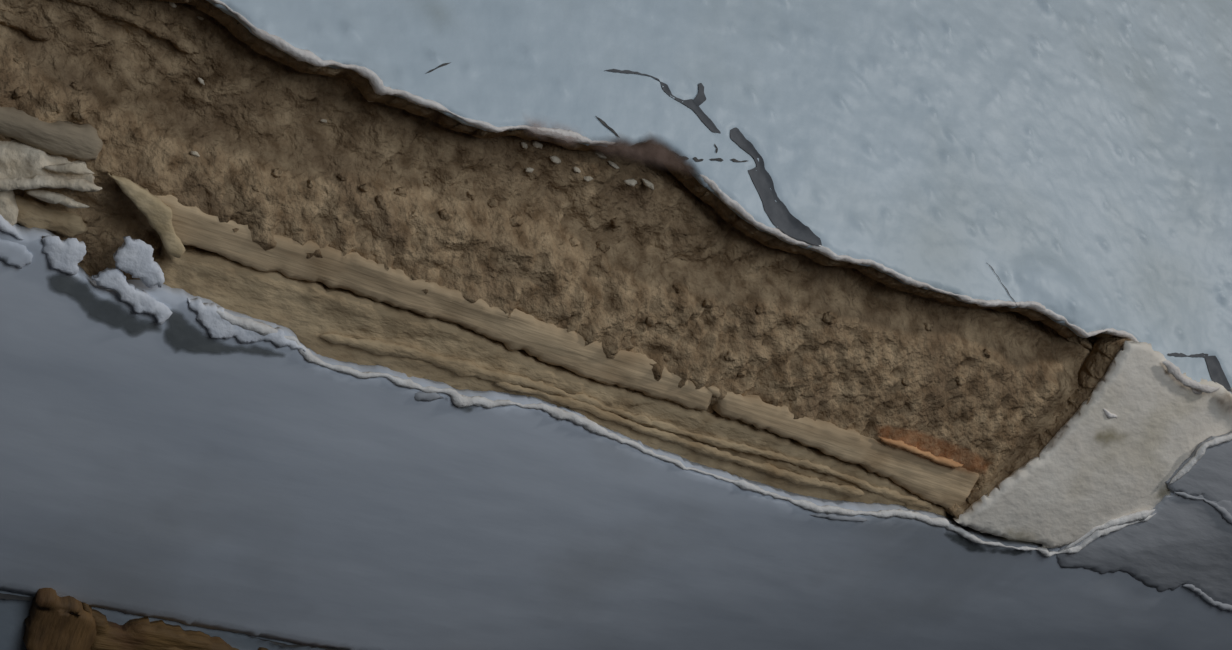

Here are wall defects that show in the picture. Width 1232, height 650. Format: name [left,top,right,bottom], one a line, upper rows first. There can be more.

flaking render [0,0,1139,486]
crack [605,69,822,246]
flaking render [153,241,1156,558]
flaking render [944,336,1232,548]
flaking render [1056,494,1232,612]